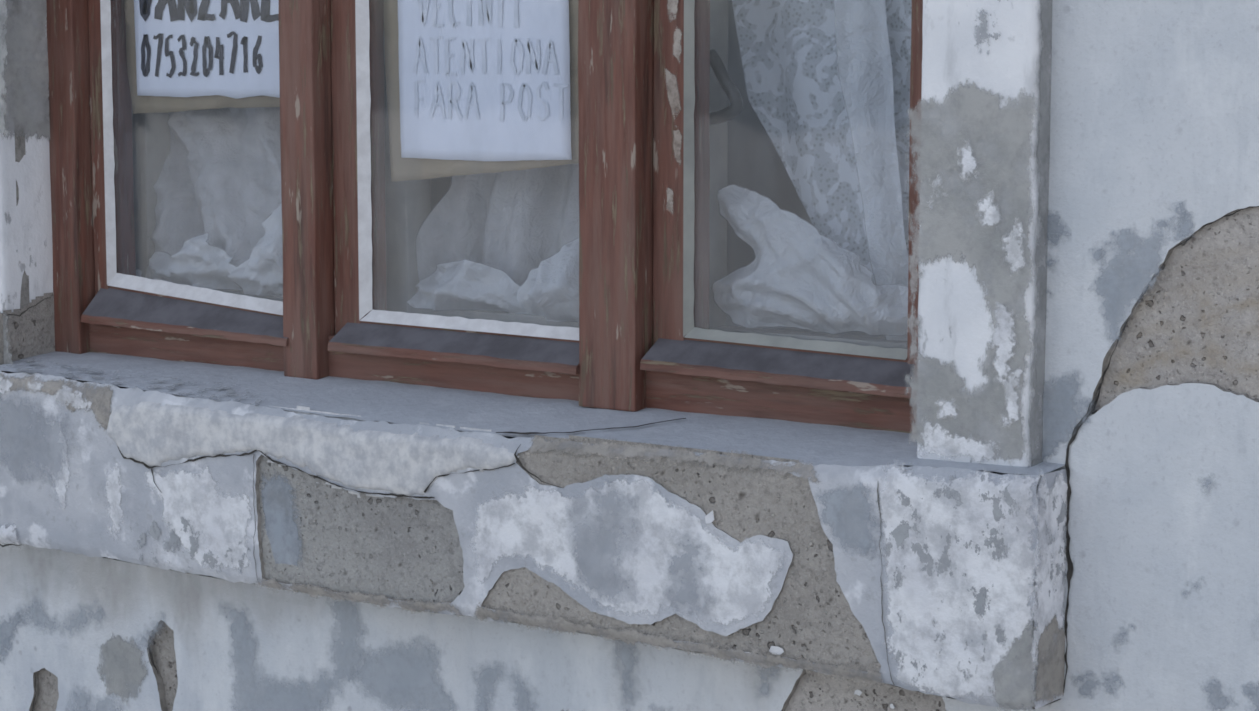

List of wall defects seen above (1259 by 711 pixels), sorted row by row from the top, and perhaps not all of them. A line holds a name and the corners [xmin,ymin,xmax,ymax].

peeling [0,0,50,142]
flaking render [0,292,262,429]
peeling [473,0,1259,711]
peeling [105,463,123,540]
crack [118,418,686,582]
flaking render [138,456,465,711]
flaking render [32,669,59,711]
peeling [97,622,178,711]